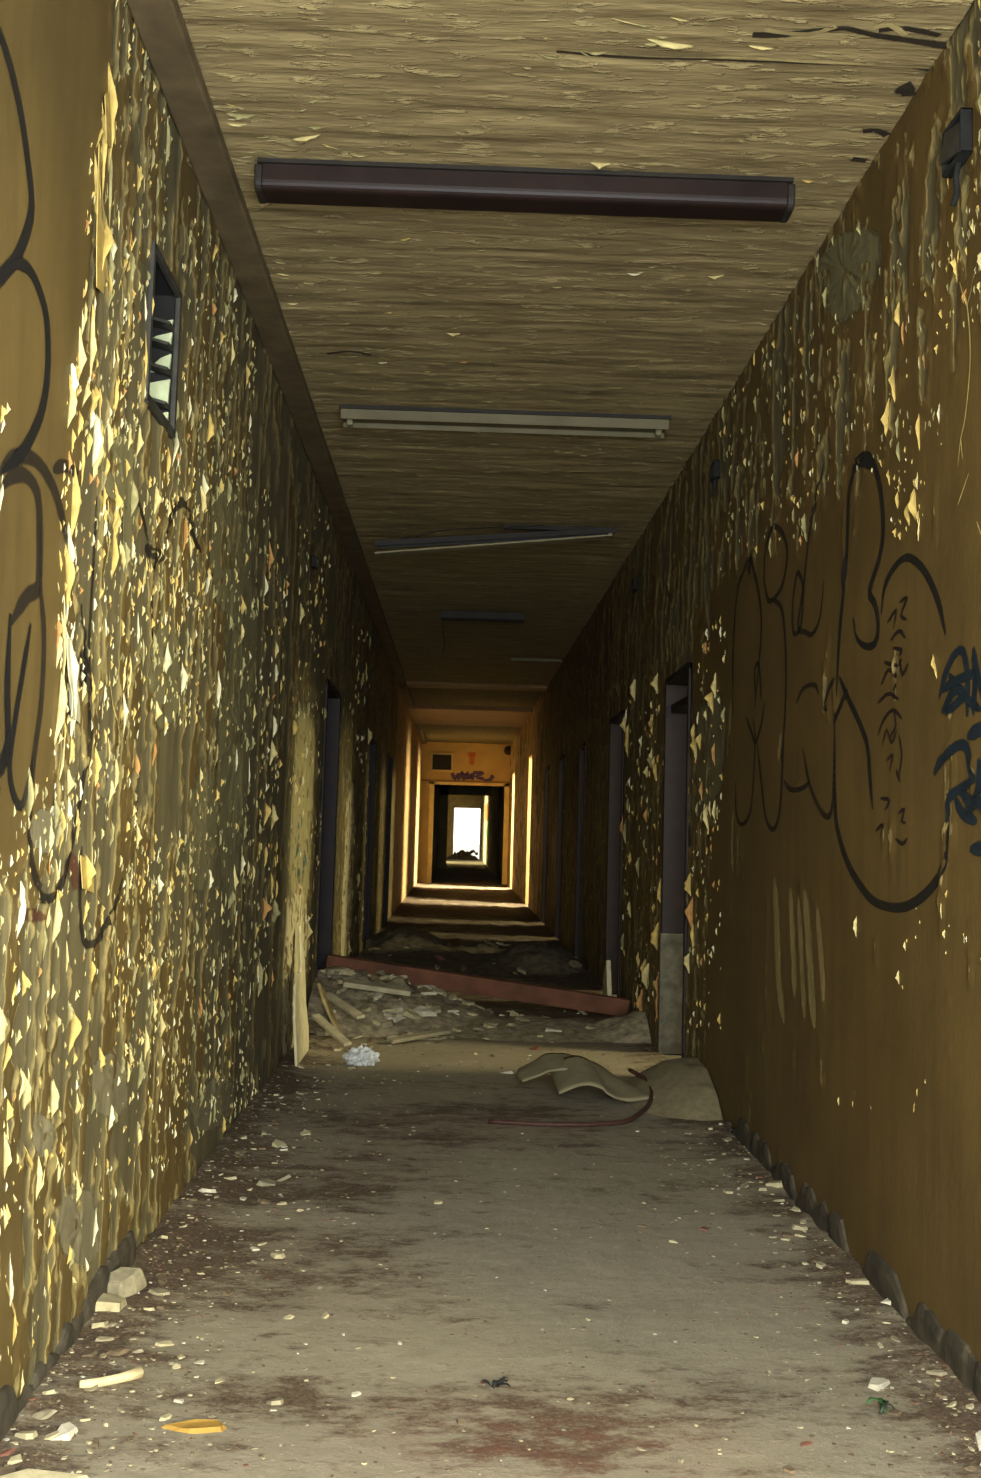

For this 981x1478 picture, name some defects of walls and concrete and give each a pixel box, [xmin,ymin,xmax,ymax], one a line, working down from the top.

peeling [224,100,365,158]
peeling [601,18,709,61]
spalling [0,0,331,1395]
spalling [340,630,372,957]
peeling [620,672,664,1022]
spalling [15,1422,78,1441]